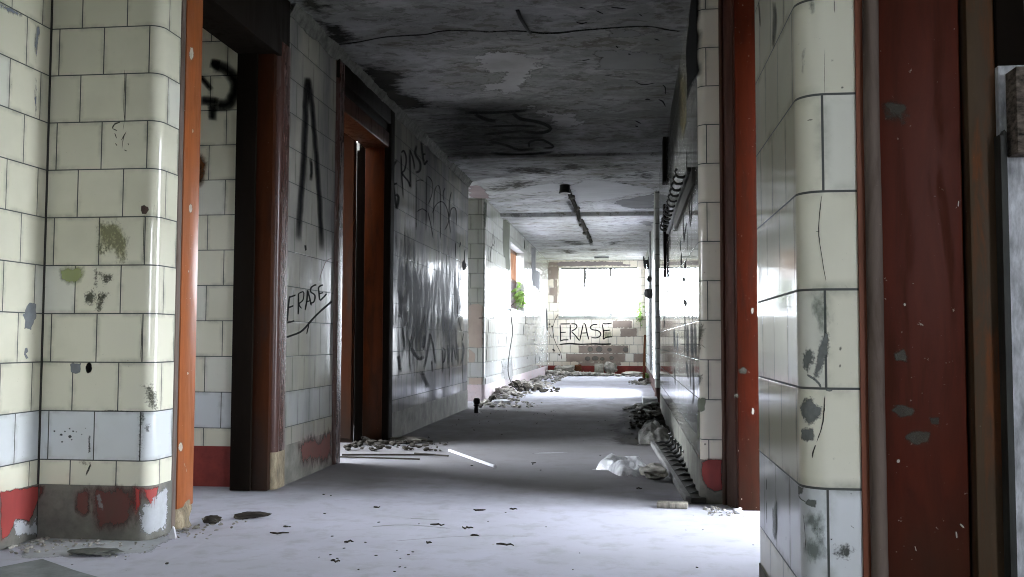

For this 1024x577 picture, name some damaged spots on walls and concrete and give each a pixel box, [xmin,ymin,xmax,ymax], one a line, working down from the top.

crack [339,26,680,45]
peeling [474,51,543,95]
crack [816,196,826,279]
peeling [800,398,821,442]
peeling [298,431,332,464]
peeling [0,486,43,539]
peeling [75,486,158,529]